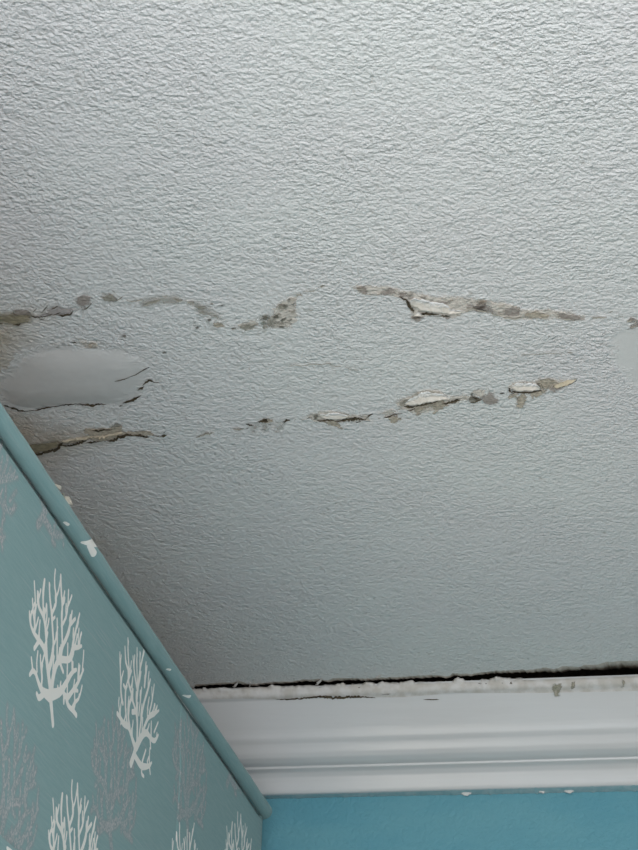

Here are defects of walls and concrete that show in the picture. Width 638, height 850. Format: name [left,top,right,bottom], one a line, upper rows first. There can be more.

peeling [0,295,92,326]
spalling [102,285,324,331]
peeling [352,285,638,329]
peeling [234,378,576,431]
crack [175,661,638,700]